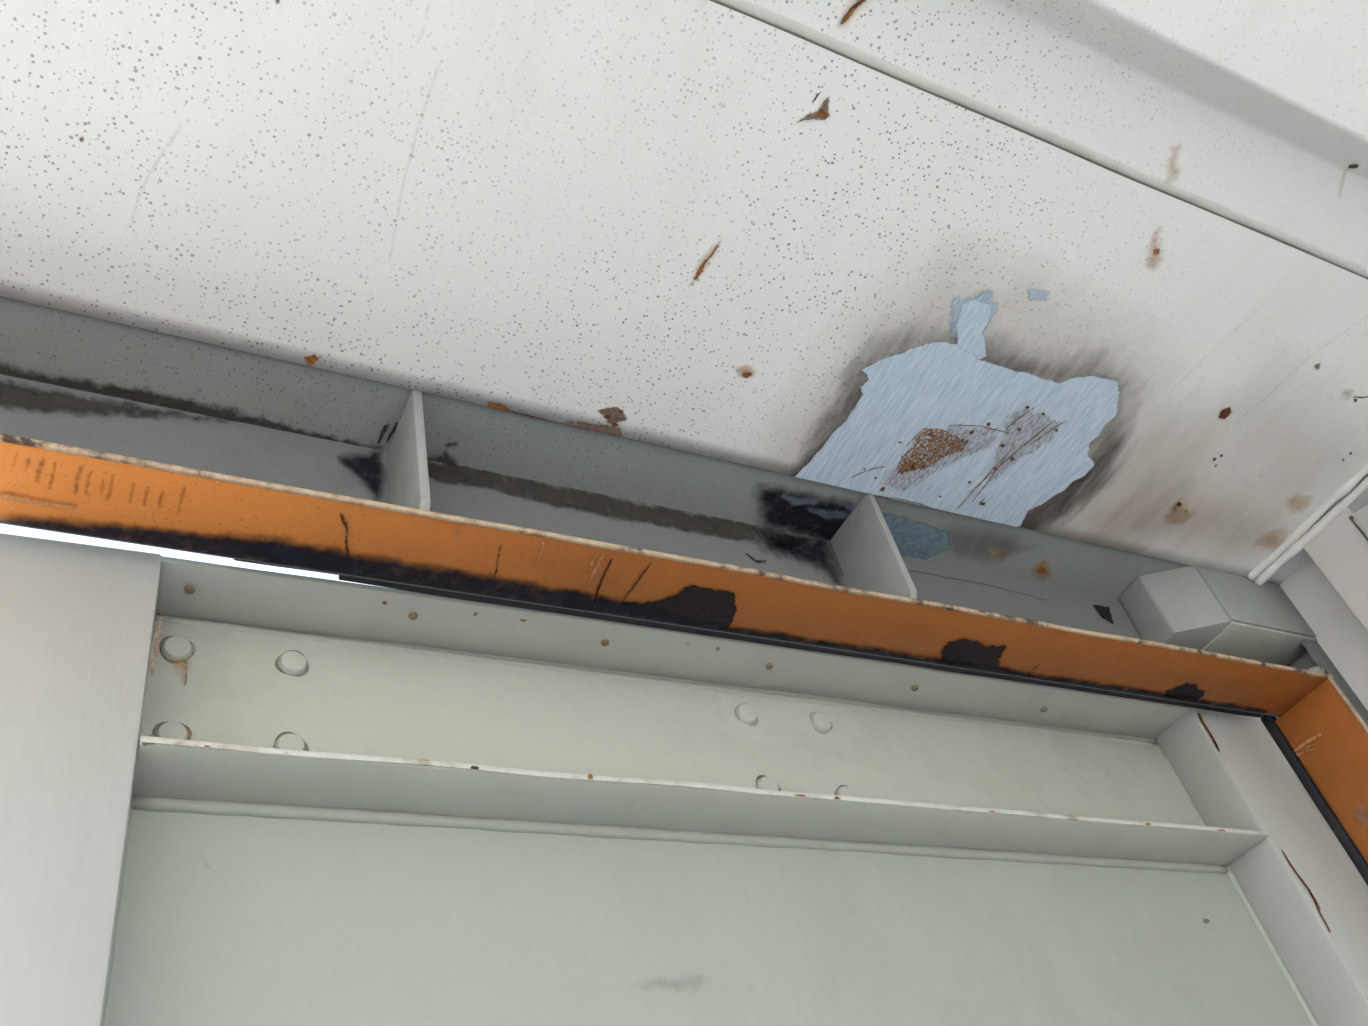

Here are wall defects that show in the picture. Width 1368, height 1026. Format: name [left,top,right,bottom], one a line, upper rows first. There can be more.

corrosion [840,0,865,24]
corrosion [694,244,719,280]
corrosion [898,422,991,476]
peeling [617,585,737,627]
peeling [941,638,1006,668]